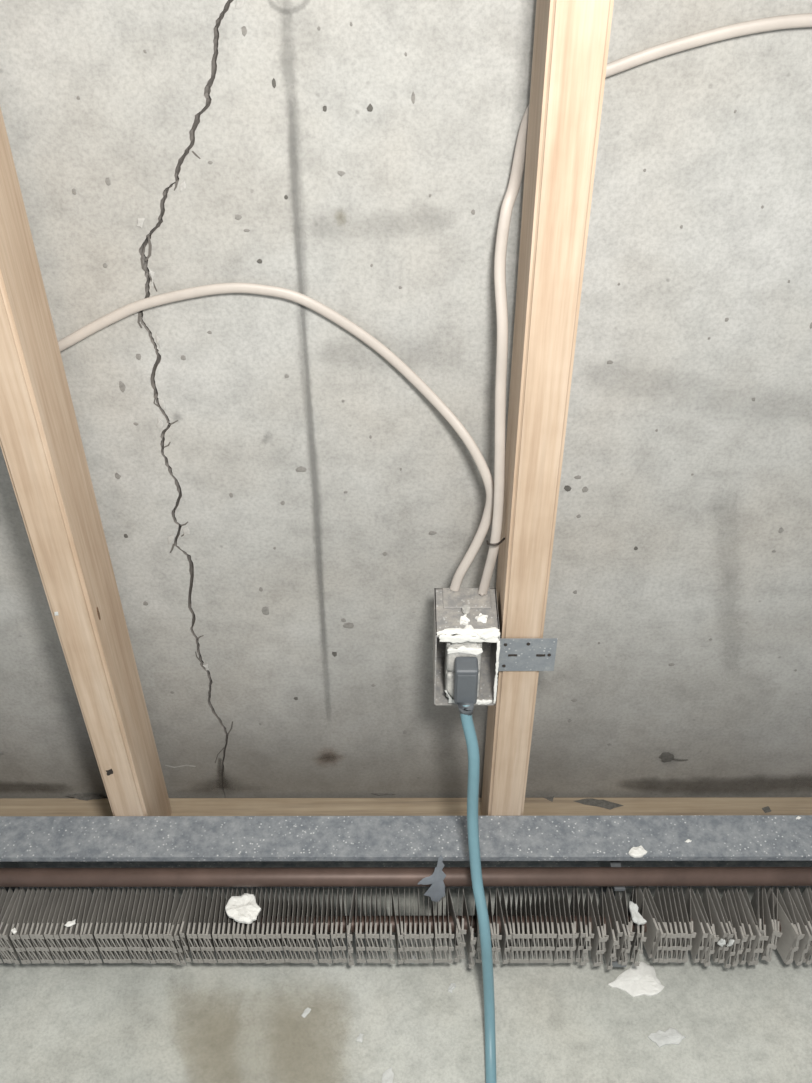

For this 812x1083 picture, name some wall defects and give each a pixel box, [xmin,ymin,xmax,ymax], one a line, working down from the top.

crack [134,0,245,795]